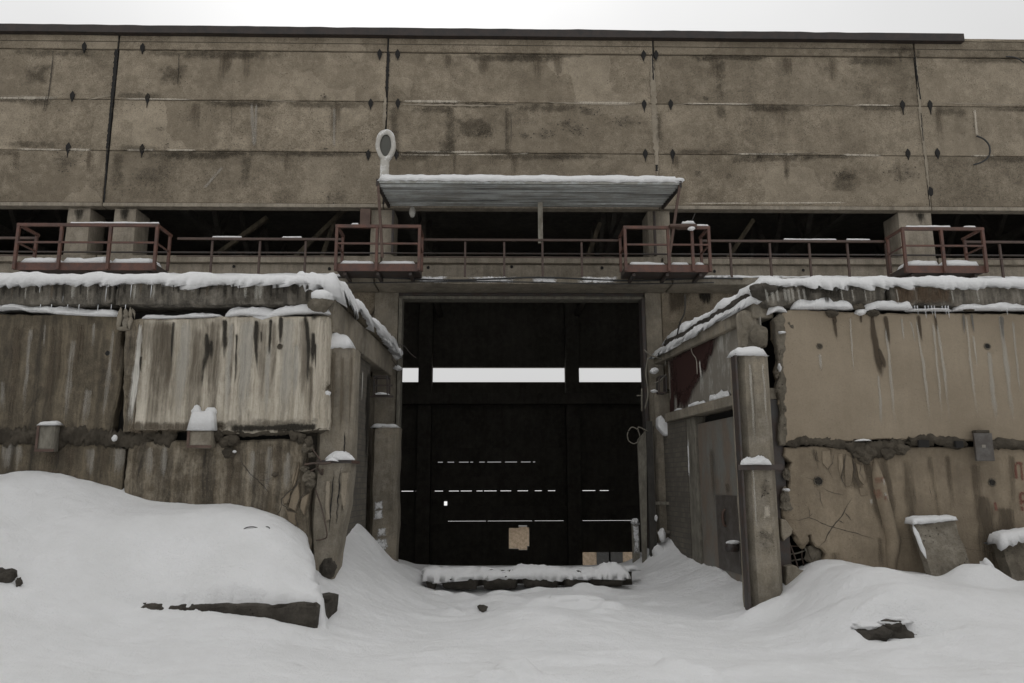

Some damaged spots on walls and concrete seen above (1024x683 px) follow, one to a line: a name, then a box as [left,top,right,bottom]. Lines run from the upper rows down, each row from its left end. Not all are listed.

leakage [201,320,238,381]
leakage [253,317,283,363]
corrosion [669,338,715,412]
spalling [771,313,794,446]
leakage [860,315,890,373]
crack [797,452,873,547]